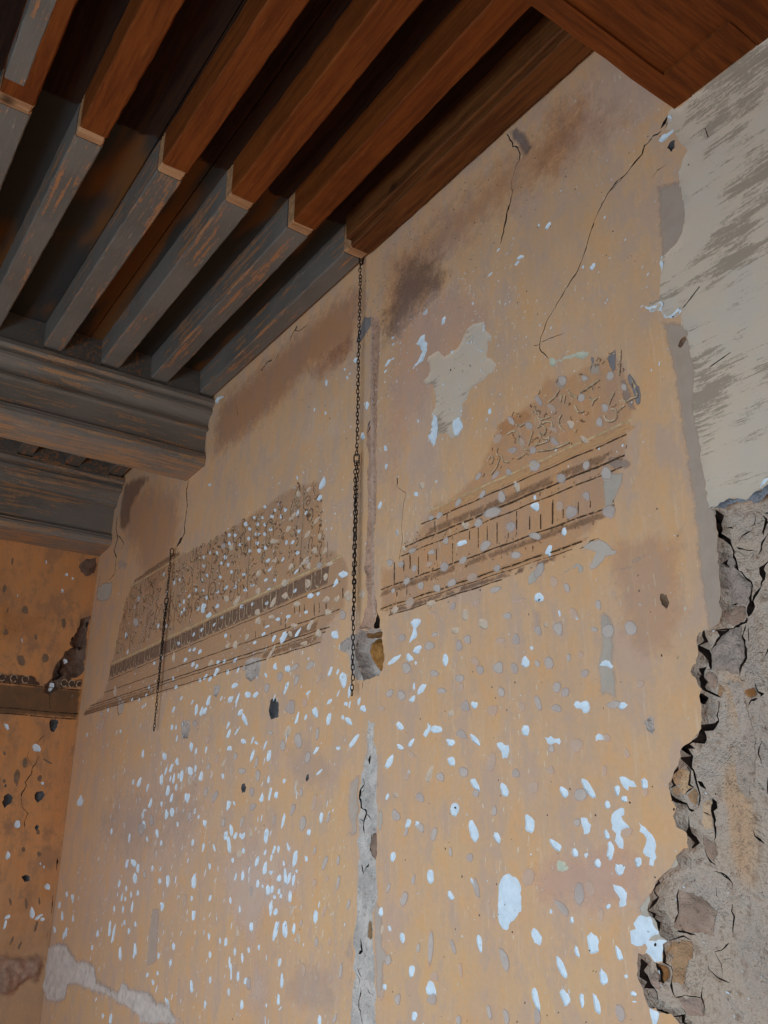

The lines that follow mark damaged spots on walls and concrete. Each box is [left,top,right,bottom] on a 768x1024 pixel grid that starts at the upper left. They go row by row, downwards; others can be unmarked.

crack [500,134,521,244]
crack [534,117,668,359]
flaking render [413,322,496,447]
flaking render [581,38,768,1024]
spalling [43,615,91,696]
spalling [181,613,422,751]
spalling [108,921,137,961]
spalling [498,874,522,930]